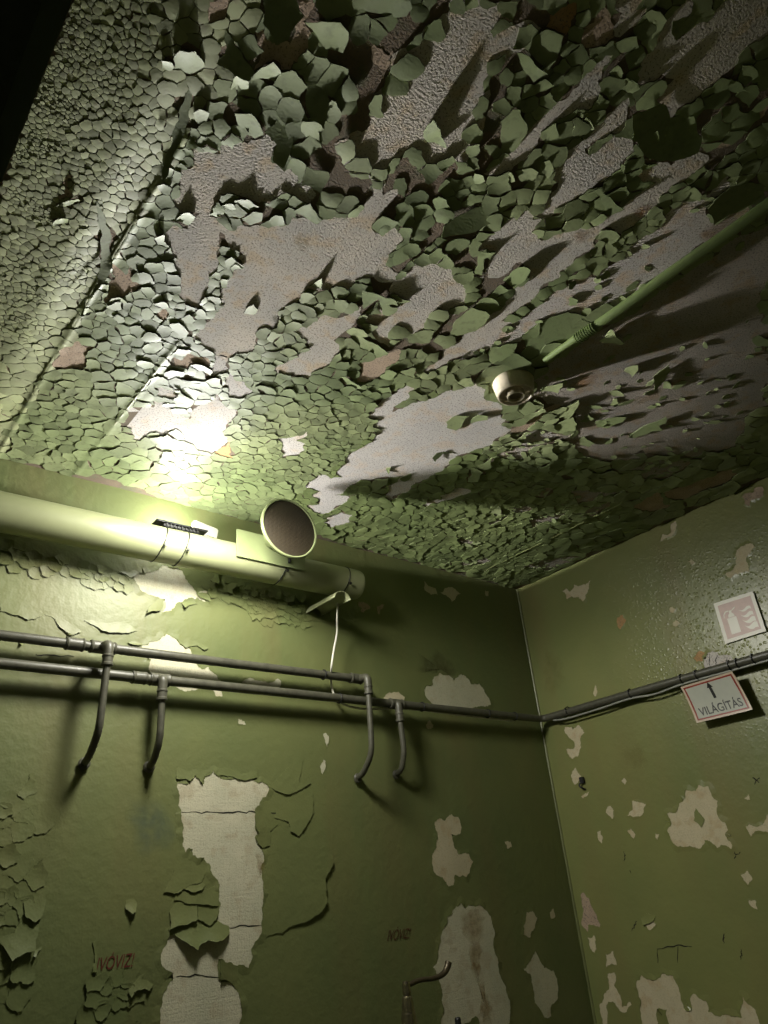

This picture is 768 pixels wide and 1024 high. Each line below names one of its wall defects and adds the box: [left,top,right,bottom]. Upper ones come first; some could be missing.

peeling [51,169,81,226]
peeling [81,0,768,536]
peeling [37,329,112,381]
peeling [118,563,214,616]
peeling [451,501,622,570]
peeling [514,551,586,575]
peeling [44,613,283,702]
peeling [421,669,494,716]
peeling [655,780,738,856]
peeling [151,765,278,1024]
peeling [428,809,513,1024]
peeling [579,891,764,1024]